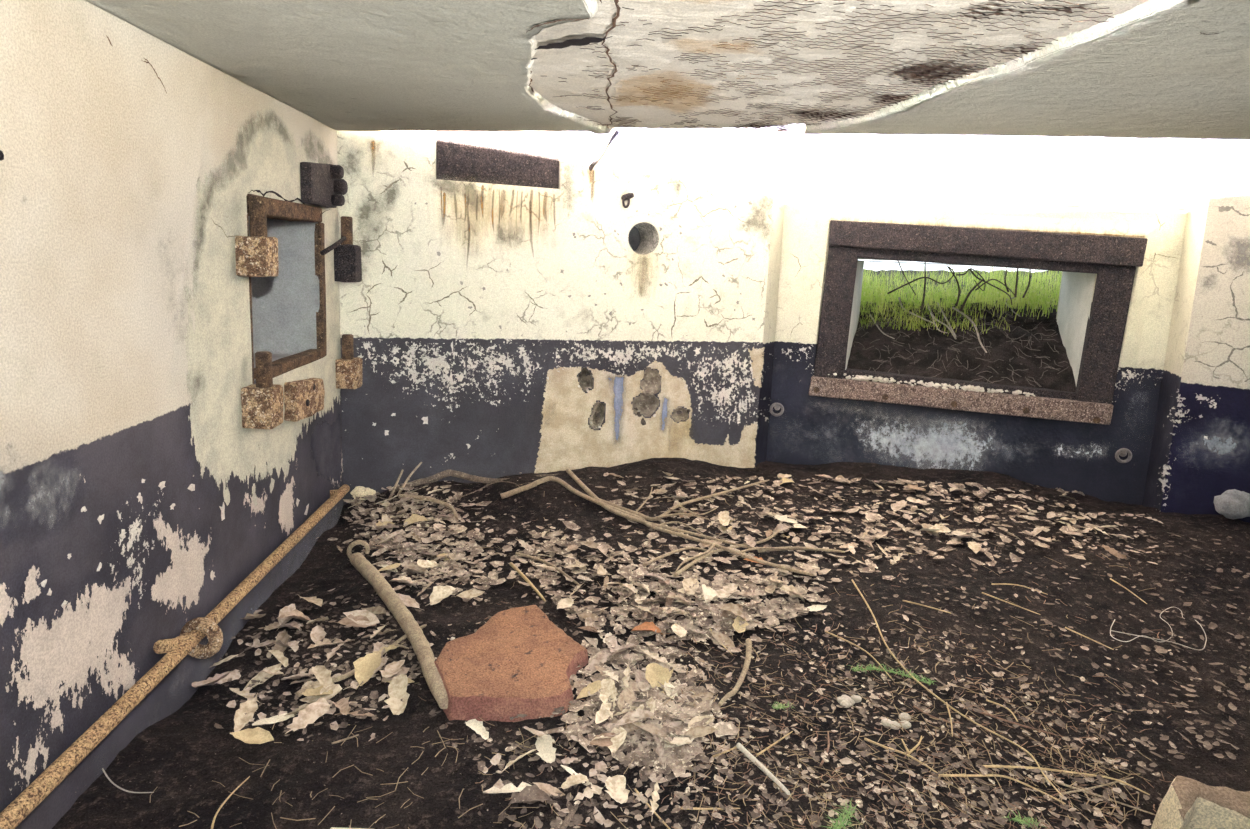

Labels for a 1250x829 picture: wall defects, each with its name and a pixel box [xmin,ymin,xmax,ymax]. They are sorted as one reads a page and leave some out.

crack [526,0,621,128]
damp [228,115,288,173]
damp [346,151,359,172]
damp [198,176,216,247]
rust [465,185,555,235]
crack [351,259,481,335]
crack [671,258,750,336]
crack [1153,214,1250,382]
flaking render [357,322,814,473]
damp [858,421,994,469]
peeling [243,476,309,536]
peeling [0,479,216,795]